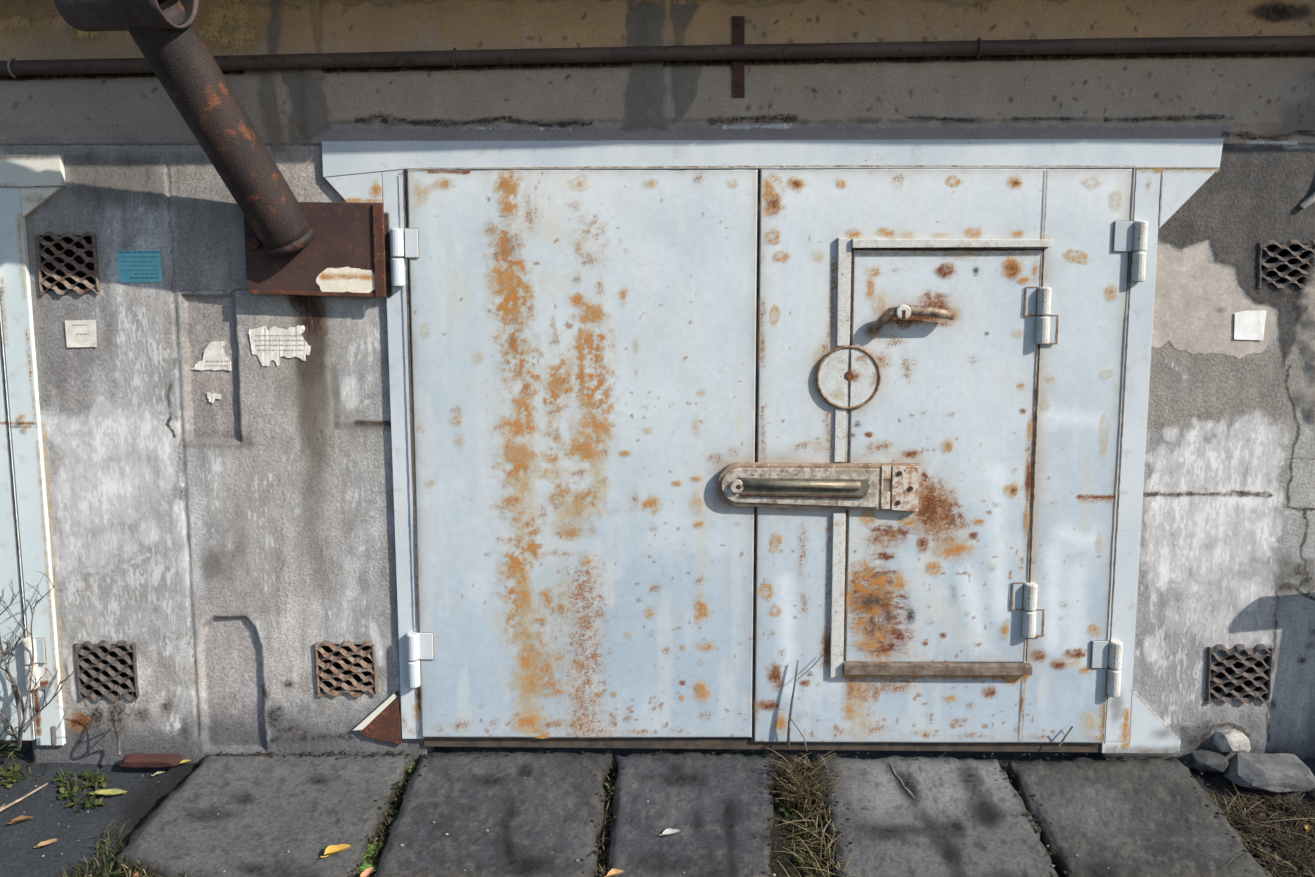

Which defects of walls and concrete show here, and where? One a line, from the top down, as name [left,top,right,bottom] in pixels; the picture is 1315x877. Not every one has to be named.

leakage [260,71,329,149]
leakage [623,0,704,130]
leakage [1254,3,1310,23]
rust [347,184,392,297]
rust [761,174,804,263]
peeling [1151,240,1279,397]
rust [479,171,652,738]
rust [755,651,786,729]
rust [801,517,831,667]
rust [834,472,1029,739]
rust [1033,649,1090,673]
crack [1207,364,1315,750]